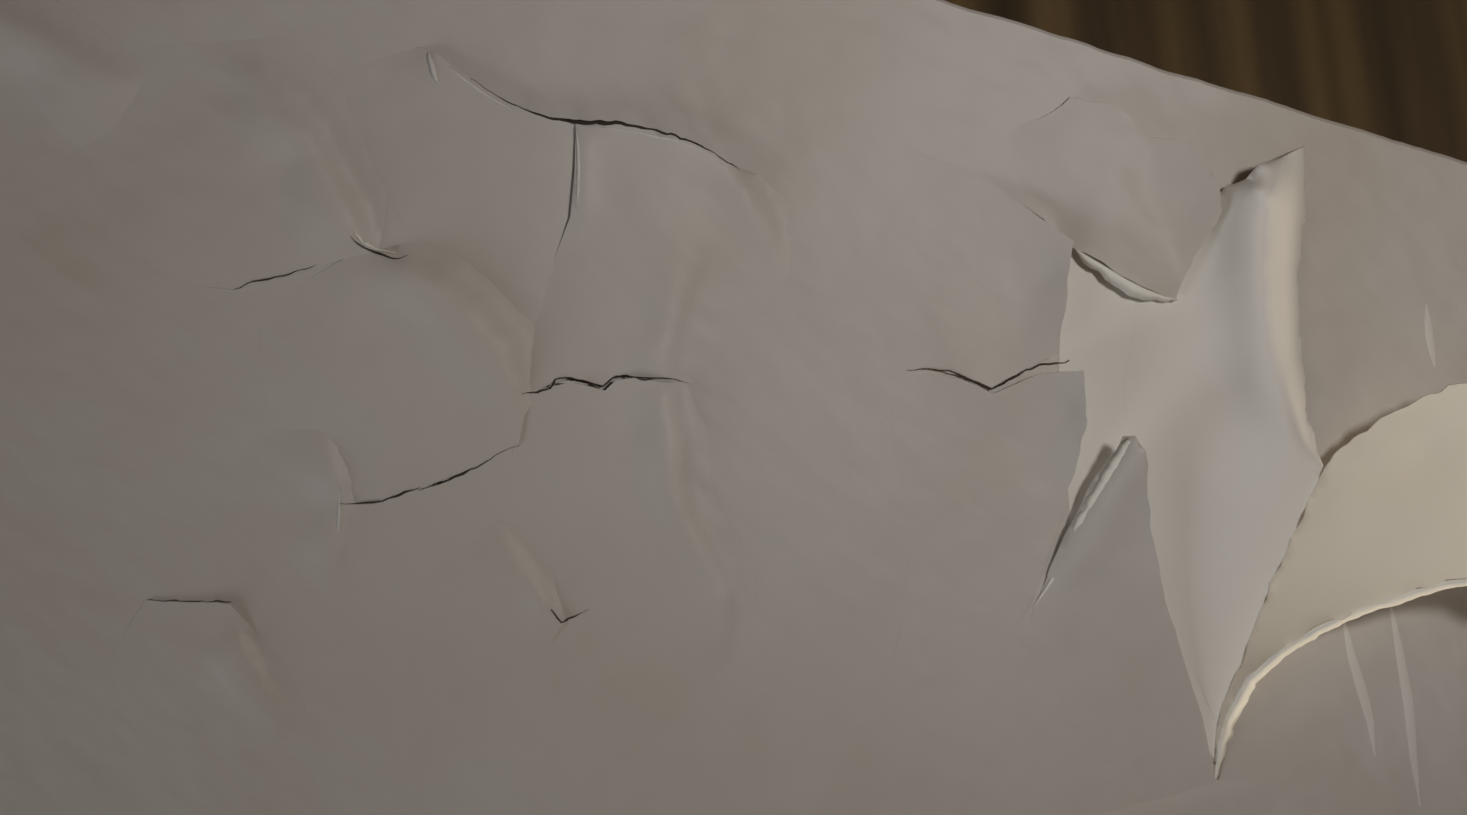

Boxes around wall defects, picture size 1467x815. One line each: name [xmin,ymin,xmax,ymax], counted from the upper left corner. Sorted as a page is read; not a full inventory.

crack [427,52,740,209]
crack [353,229,407,259]
crack [236,266,314,289]
crack [523,375,662,394]
crack [908,360,1069,390]
peeling [787,97,1467,801]
crack [337,446,517,533]
crack [150,596,230,604]